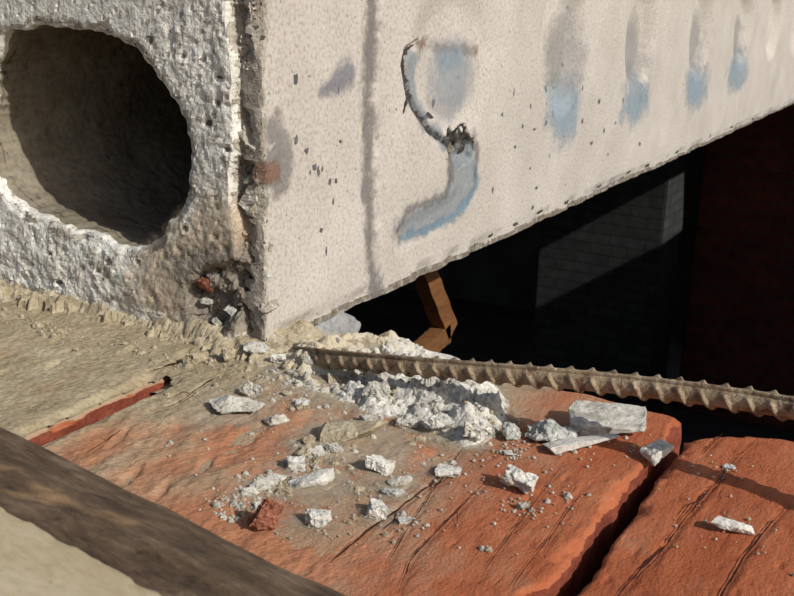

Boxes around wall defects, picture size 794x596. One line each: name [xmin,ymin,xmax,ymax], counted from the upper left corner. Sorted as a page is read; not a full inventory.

spalling [90,23,166,83]
spalling [211,0,280,343]
spalling [49,223,102,251]
spalling [131,173,195,265]
spalling [197,276,214,305]